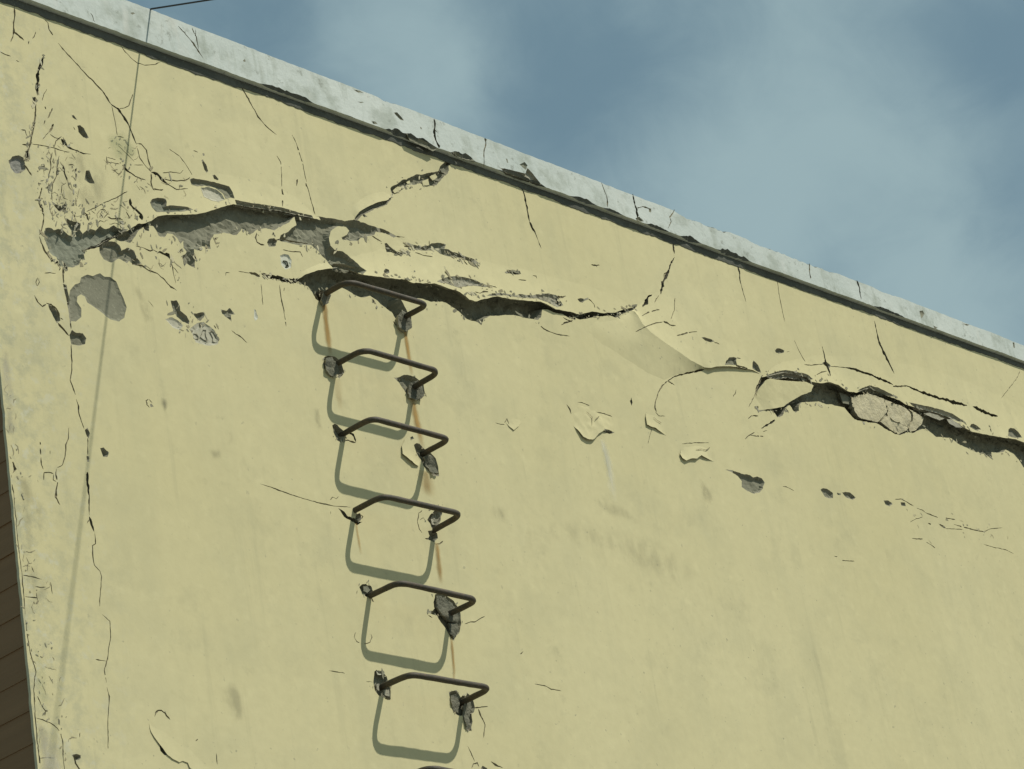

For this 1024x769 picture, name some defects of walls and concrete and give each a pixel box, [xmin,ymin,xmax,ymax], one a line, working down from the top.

spalling [571,196,622,215]
spalling [39,192,234,346]
peeling [280,254,292,269]
spalling [384,242,480,274]
spalling [314,287,331,306]
spalling [394,311,412,333]
crack [1,8,704,769]
spalling [728,470,765,494]
spalling [427,594,485,640]